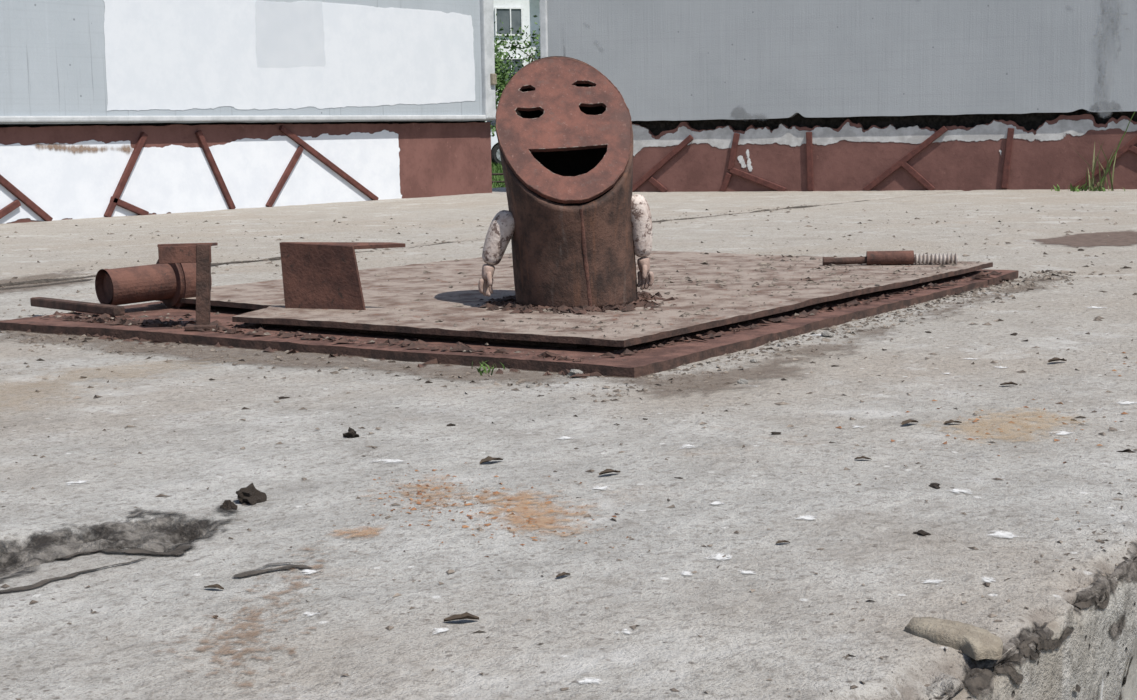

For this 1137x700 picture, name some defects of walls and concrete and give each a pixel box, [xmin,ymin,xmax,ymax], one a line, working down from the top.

peeling [632,119,1137,171]
leakage [1032,231,1137,247]
spalling [0,504,237,582]
spalling [233,562,312,577]
spalling [1071,542,1137,614]
spalling [1111,614,1126,639]
spalling [929,622,1074,700]